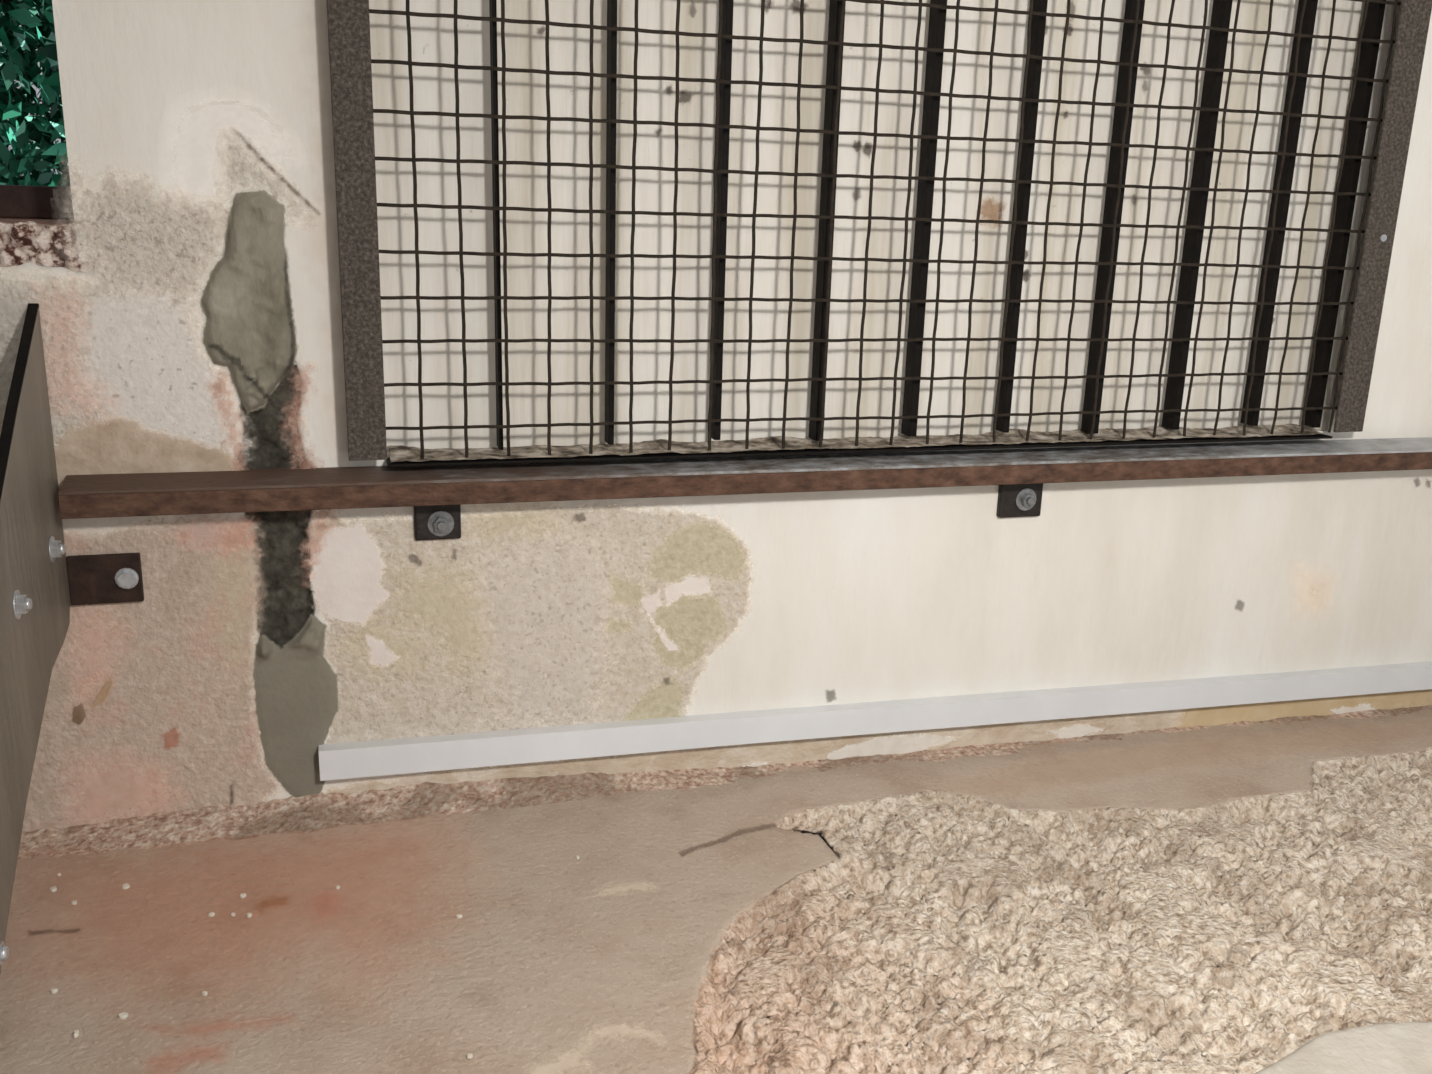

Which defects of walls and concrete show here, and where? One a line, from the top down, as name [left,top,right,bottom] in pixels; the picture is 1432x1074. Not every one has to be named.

peeling [0,133,313,490]
peeling [311,506,753,744]
crack [681,825,774,855]
peeling [331,689,1432,794]
spalling [688,747,1432,1074]